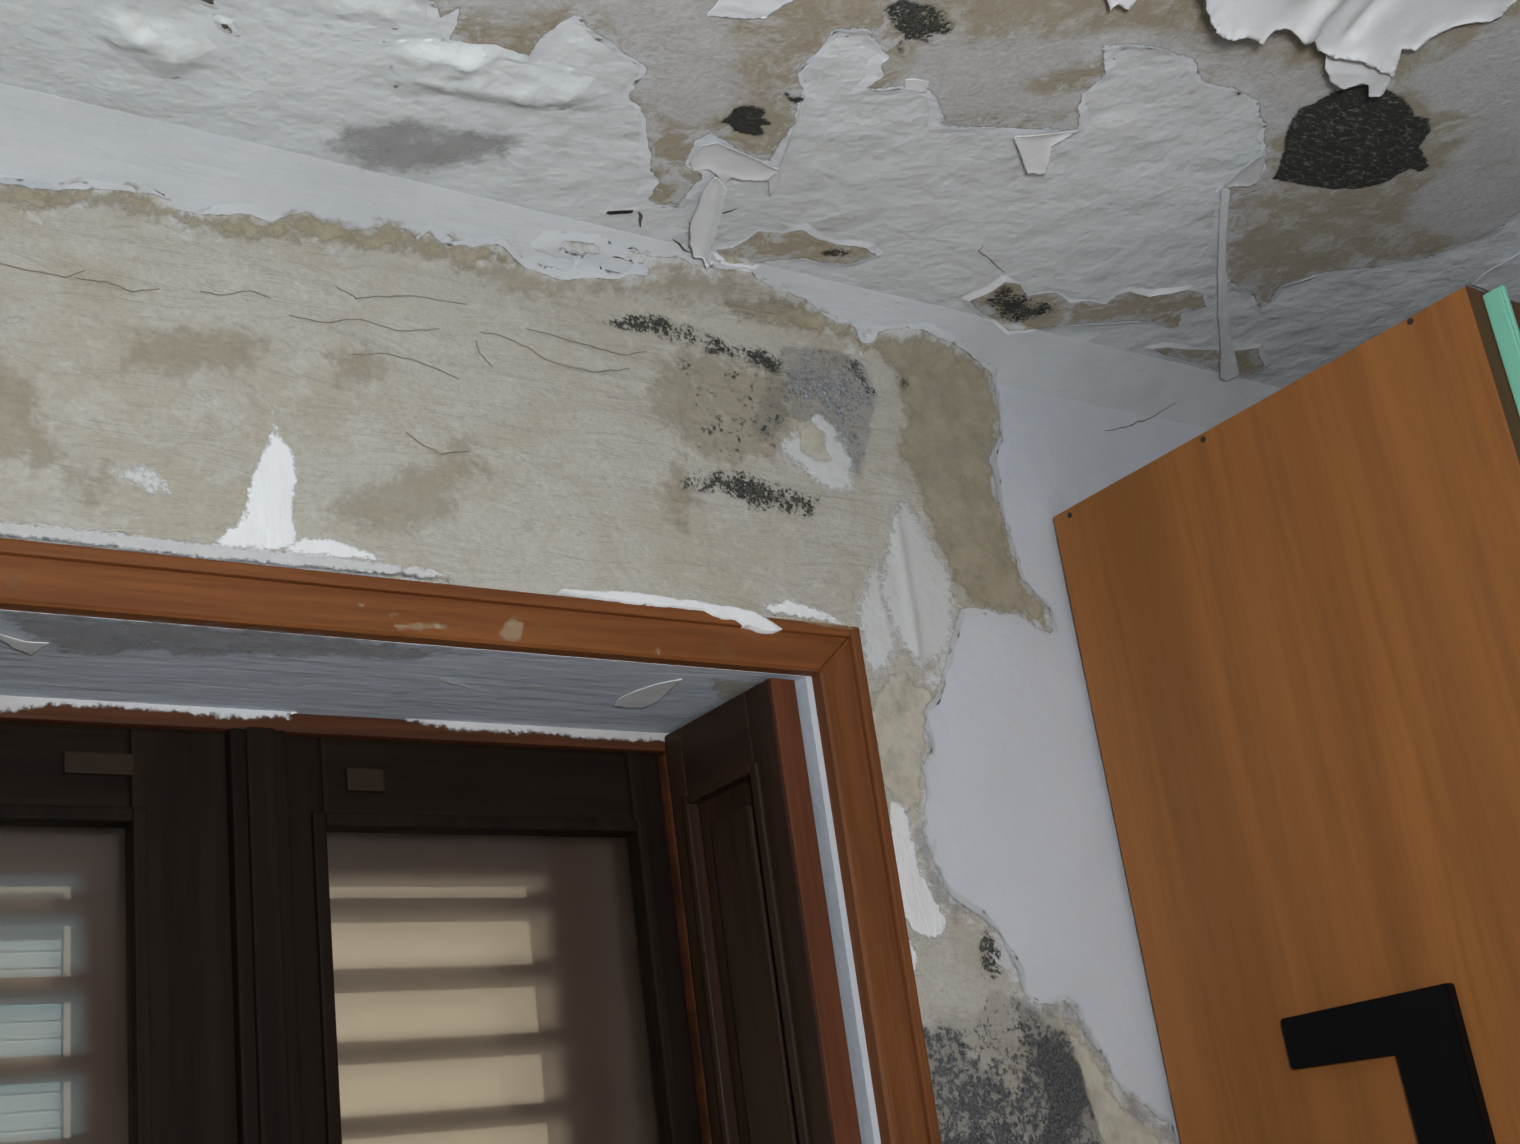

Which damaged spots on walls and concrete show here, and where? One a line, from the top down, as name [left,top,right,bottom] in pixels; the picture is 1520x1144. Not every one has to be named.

peeling [413,0,1520,311]
mould [1273,84,1430,189]
crack [0,263,157,293]
crack [200,286,646,380]
water stain [609,298,1045,625]
peeling [0,177,1180,1144]
mould [979,928,1001,980]
water stain [923,997,1160,1144]